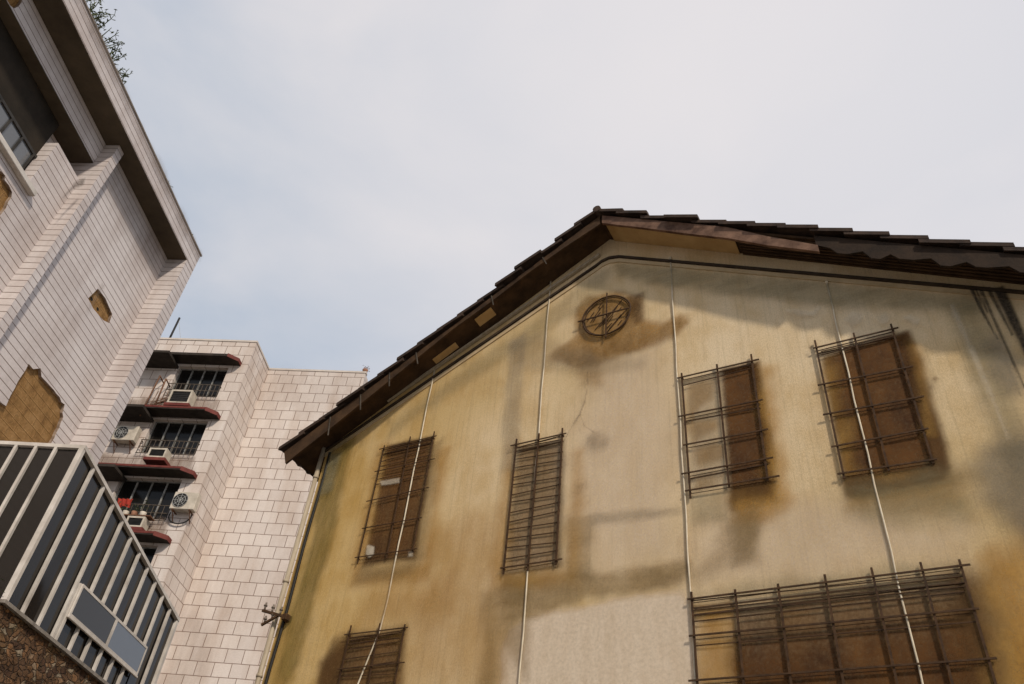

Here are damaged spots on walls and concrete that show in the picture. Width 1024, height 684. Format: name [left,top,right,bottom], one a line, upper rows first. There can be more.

spalling [0,171,12,215]
spalling [88,289,112,323]
leakage [971,287,1024,367]
spalling [0,364,65,443]